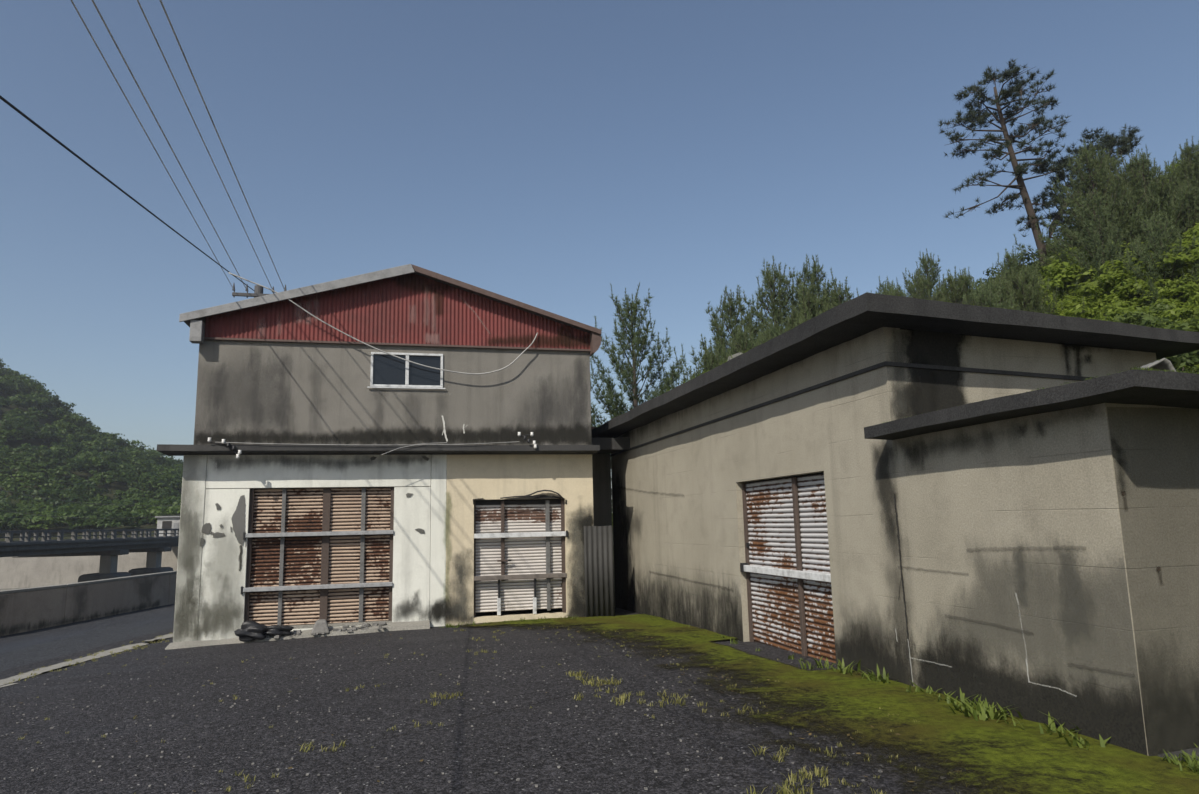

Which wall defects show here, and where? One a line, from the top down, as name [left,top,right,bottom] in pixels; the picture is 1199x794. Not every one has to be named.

damp [894,329,967,420]
peeling [200,495,247,547]
damp [875,445,896,532]
damp [174,517,239,638]
damp [834,630,1199,756]